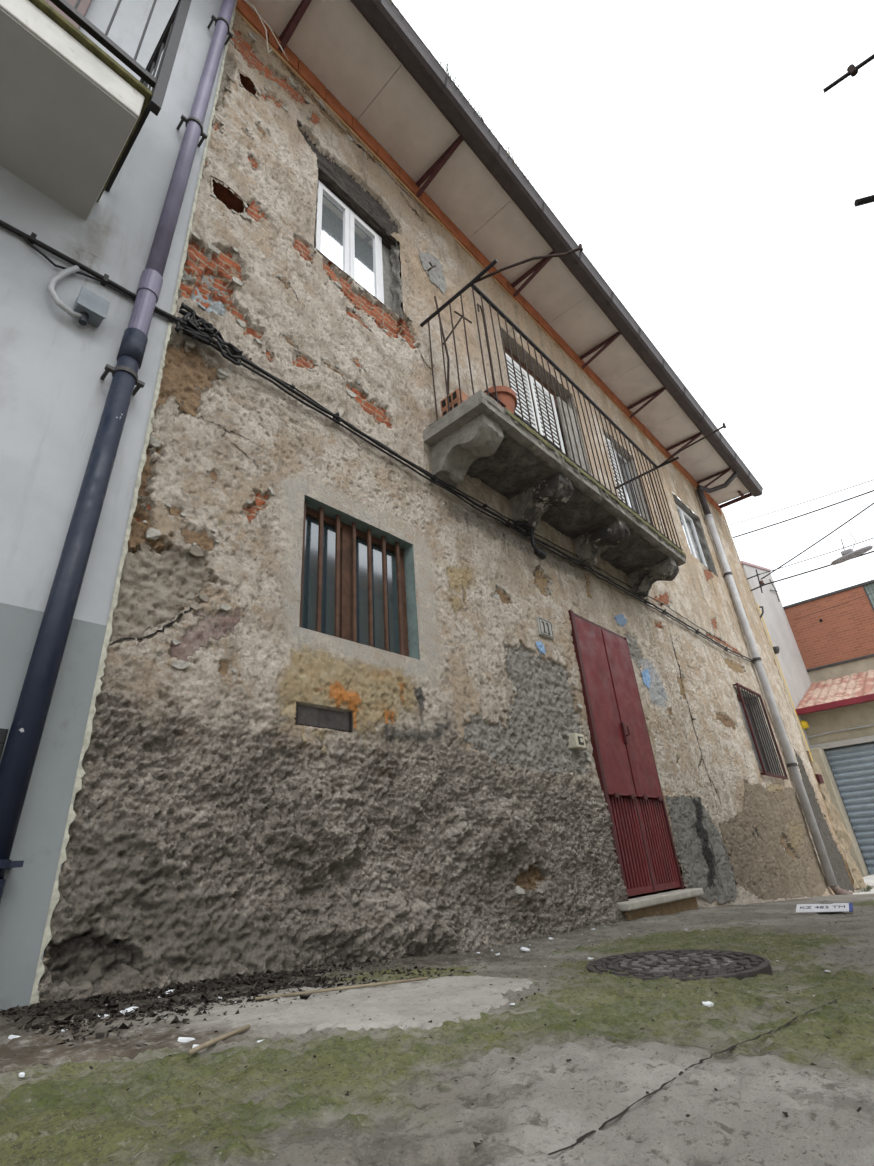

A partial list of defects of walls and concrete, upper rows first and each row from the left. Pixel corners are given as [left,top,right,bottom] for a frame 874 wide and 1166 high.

spalling [212,29,378,170]
spalling [204,162,267,222]
spalling [178,232,275,375]
spalling [293,233,418,349]
spalling [282,333,392,429]
spalling [243,487,276,523]
crack [109,592,220,645]
spalling [218,661,237,676]
corrosion [278,645,417,753]
spalling [463,643,592,778]